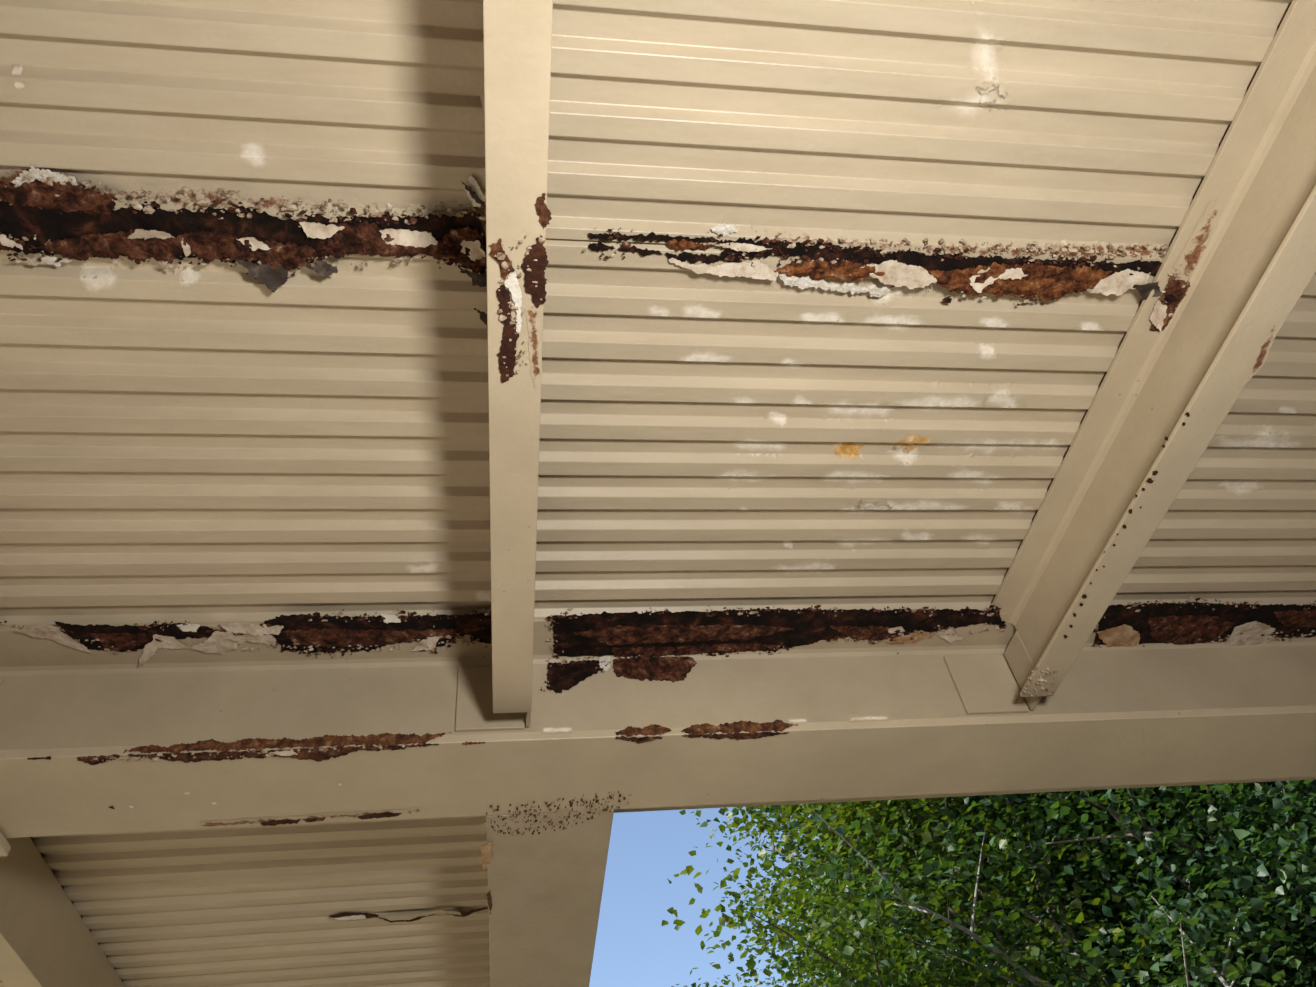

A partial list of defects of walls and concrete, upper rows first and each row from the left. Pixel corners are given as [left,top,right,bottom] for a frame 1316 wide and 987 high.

rust [0,163,552,389]
rust [588,201,1225,332]
rust [54,621,218,652]
rust [264,613,492,654]
rust [546,608,1006,693]
rust [77,732,486,765]
rust [541,726,573,734]
rust [615,718,808,744]